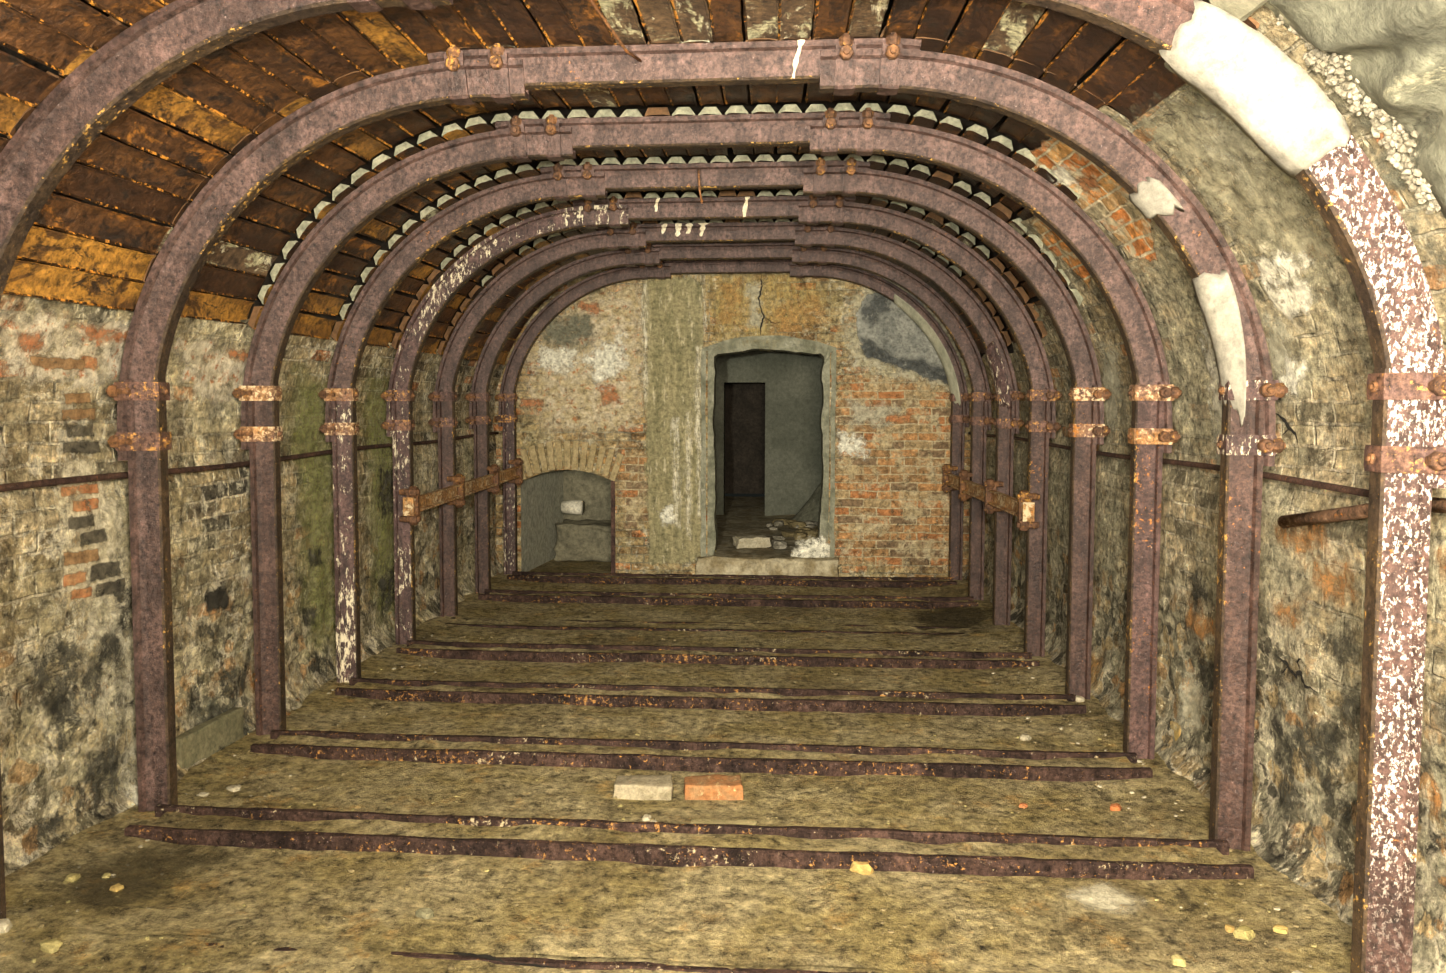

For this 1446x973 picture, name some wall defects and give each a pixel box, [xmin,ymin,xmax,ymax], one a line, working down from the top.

flaking render [1031,134,1158,262]
leakage [27,588,138,806]
leakage [37,811,65,835]